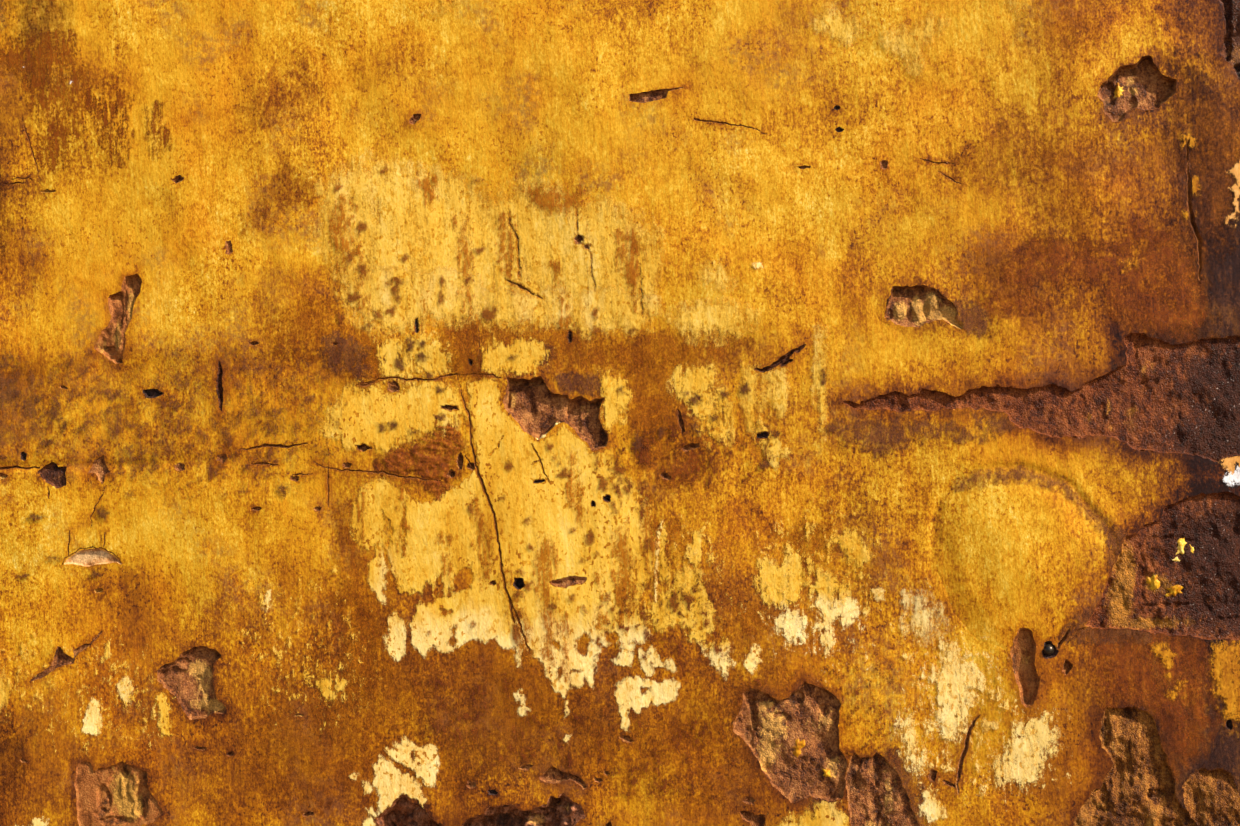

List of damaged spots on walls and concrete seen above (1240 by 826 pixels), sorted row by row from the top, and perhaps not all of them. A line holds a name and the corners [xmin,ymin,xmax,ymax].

spalling [1093,50,1183,126]
spalling [1206,0,1240,85]
spalling [90,269,147,371]
crack [0,461,128,579]
crack [234,318,550,659]
peeling [308,151,1240,826]
corrosion [826,409,1015,459]
peeling [227,566,366,726]
spalling [0,625,231,826]
peeling [188,742,239,762]